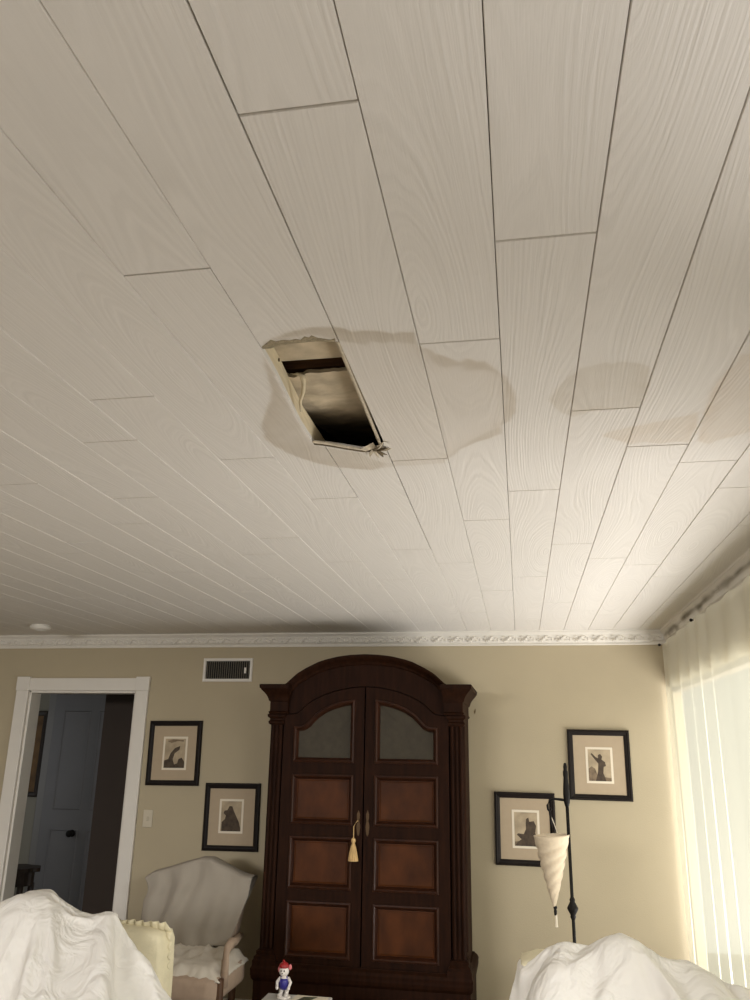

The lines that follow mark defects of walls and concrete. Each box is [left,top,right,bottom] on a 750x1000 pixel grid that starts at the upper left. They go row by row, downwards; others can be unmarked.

spalling [314,423,344,444]